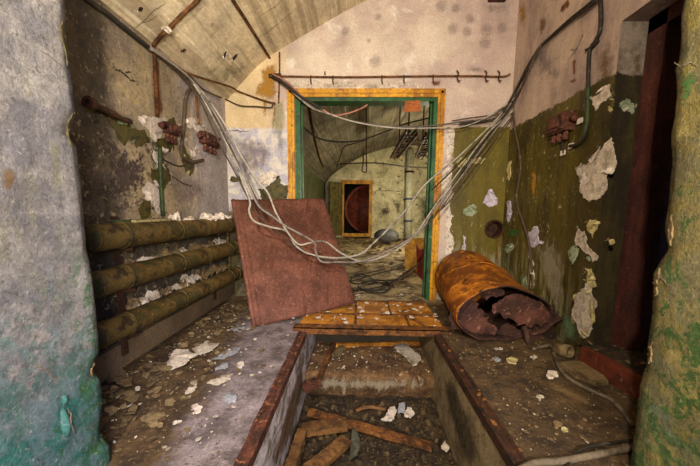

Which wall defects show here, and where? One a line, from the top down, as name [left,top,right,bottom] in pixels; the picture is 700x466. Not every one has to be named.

peeling [589,77,637,115]
peeling [107,115,204,219]
peeling [441,130,486,257]
peeling [463,189,498,218]
peeling [576,137,617,202]
peeling [521,226,544,288]
peeling [568,220,600,339]